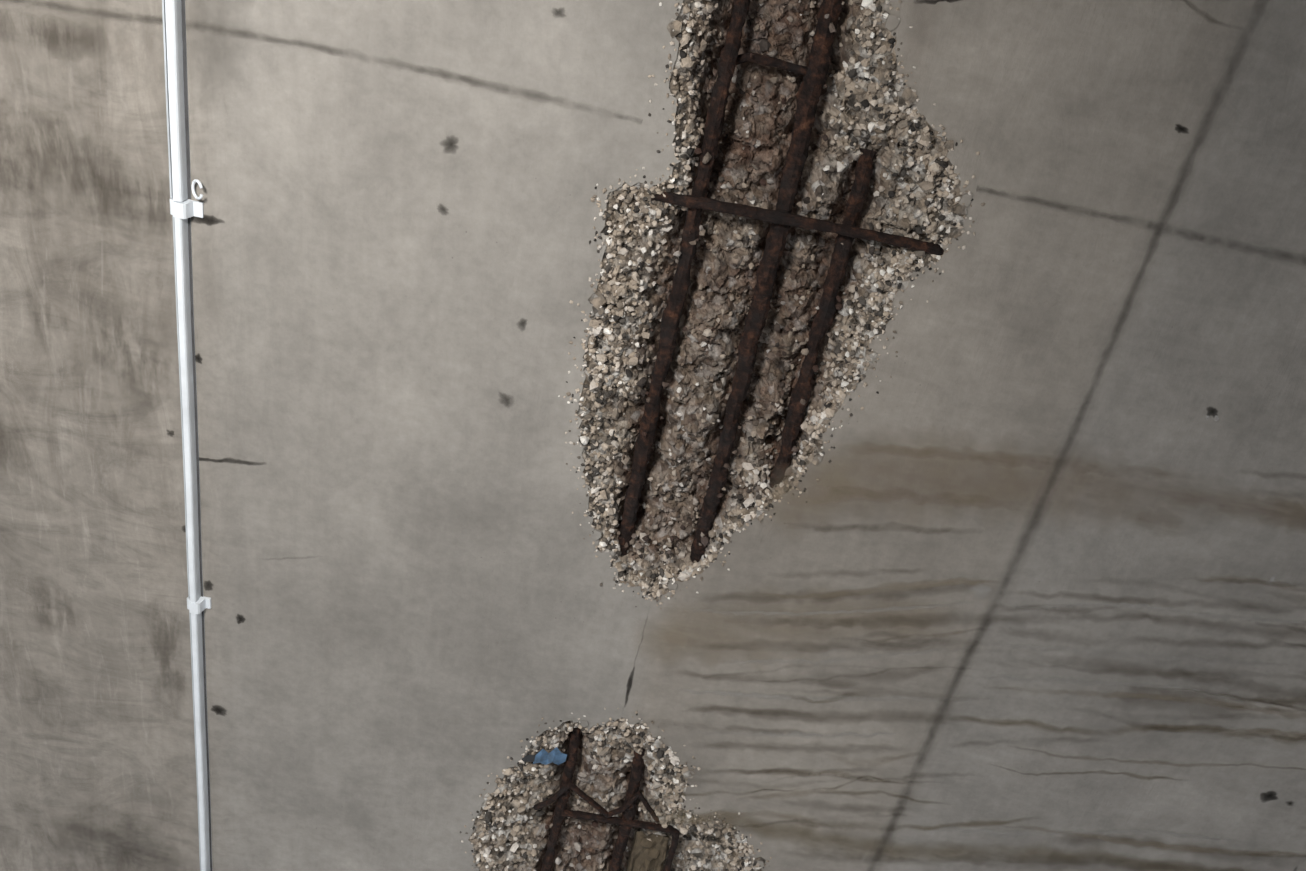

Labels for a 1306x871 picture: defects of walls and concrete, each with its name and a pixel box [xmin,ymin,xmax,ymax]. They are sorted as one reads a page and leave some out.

spalling [558,0,985,609]
spalling [460,707,772,871]